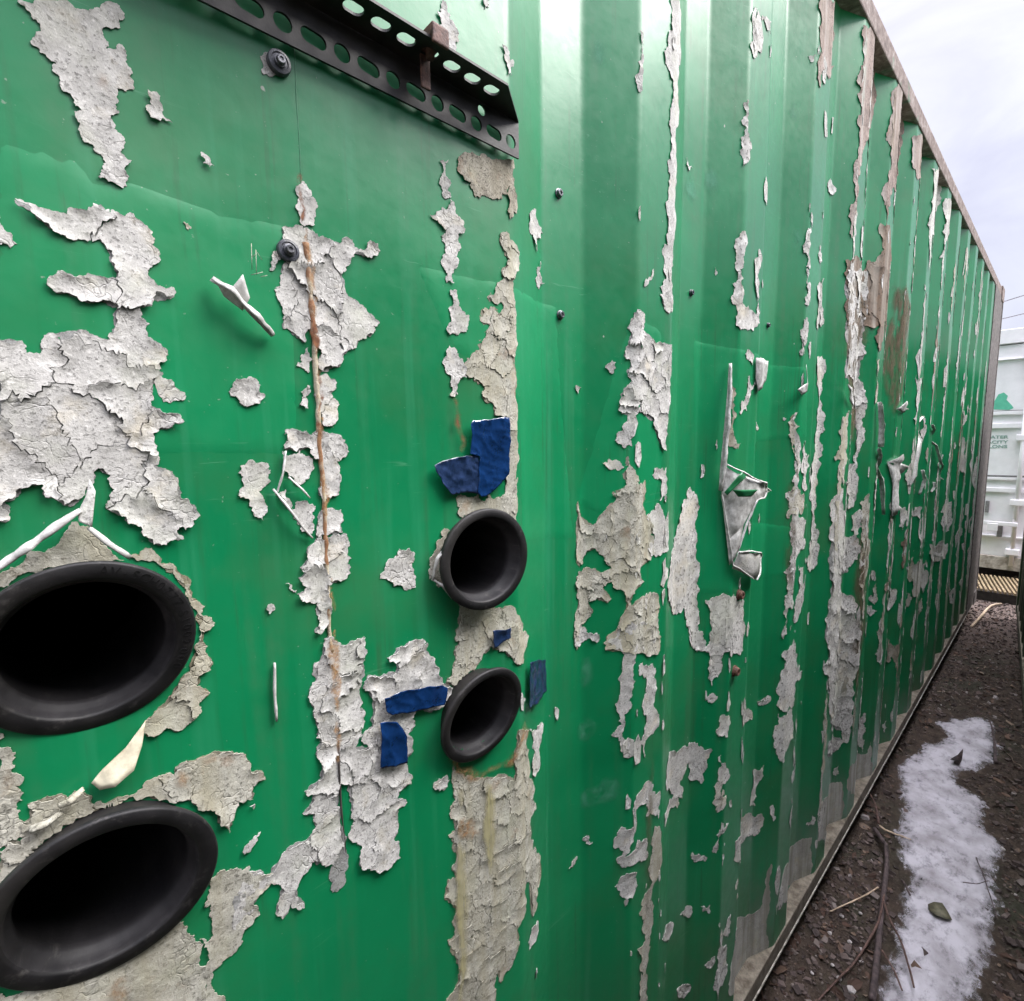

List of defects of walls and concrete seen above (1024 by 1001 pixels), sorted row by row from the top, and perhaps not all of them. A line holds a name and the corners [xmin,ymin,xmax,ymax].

peeling [17,0,134,188]
peeling [927,166,951,267]
corrosion [305,235,320,354]
peeling [430,152,544,520]
corrosion [844,223,911,435]
peeling [905,377,927,494]
peeling [951,410,967,476]
peeling [0,181,544,1001]
peeling [574,309,746,757]
peeling [890,490,964,612]
corrosion [328,630,341,709]